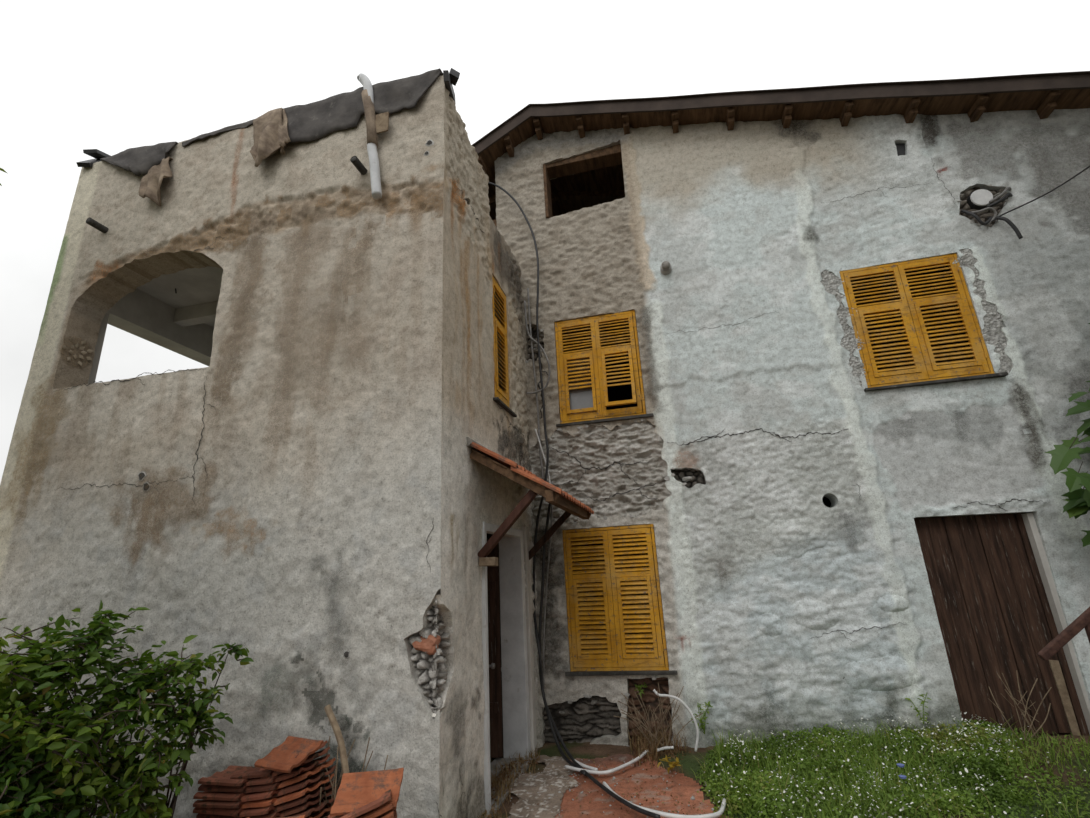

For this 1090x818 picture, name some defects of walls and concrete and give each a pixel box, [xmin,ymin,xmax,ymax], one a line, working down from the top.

peeling [820,270,866,387]
peeling [952,249,1014,374]
crack [667,428,847,446]
spalling [409,598,450,714]
spalling [543,675,673,746]